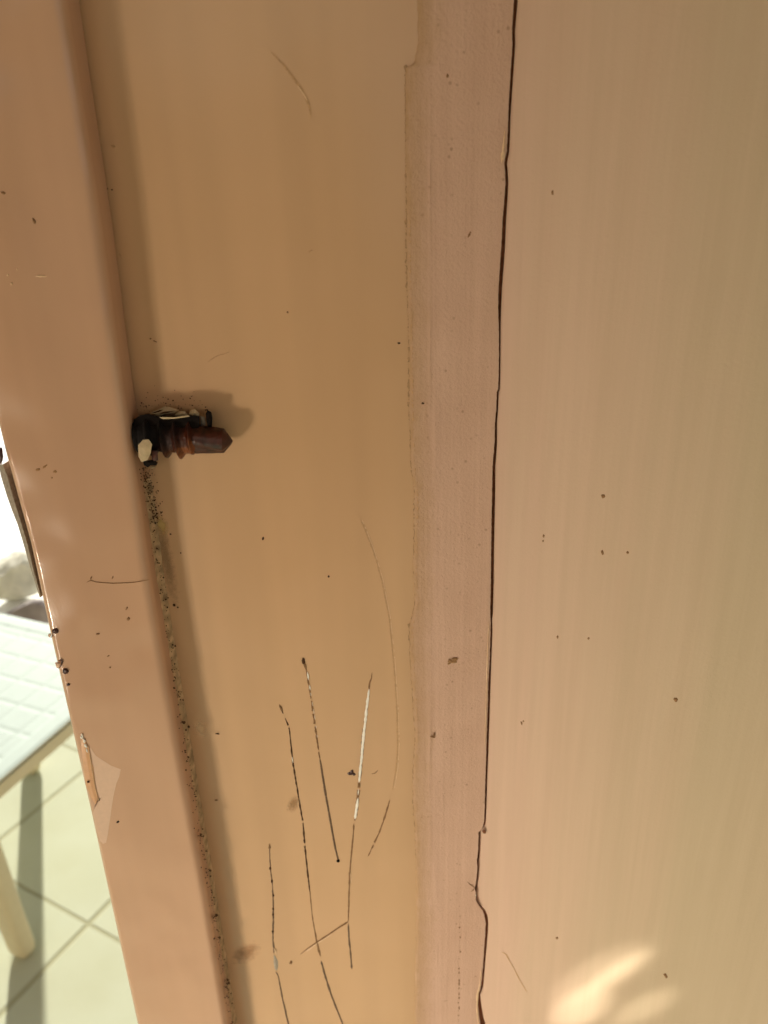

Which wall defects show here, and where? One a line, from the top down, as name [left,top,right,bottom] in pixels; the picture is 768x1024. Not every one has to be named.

peeling [80,733,121,844]
crack [458,0,518,1024]